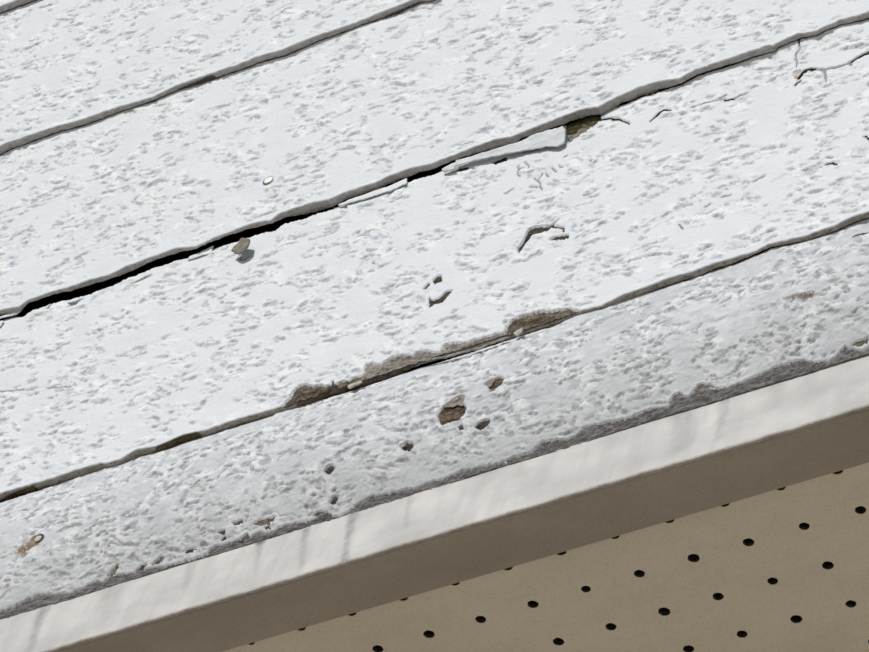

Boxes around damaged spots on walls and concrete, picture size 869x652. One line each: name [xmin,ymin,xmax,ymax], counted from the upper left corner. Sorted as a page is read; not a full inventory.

crack [793,39,869,86]
crack [505,147,567,194]
crack [519,225,569,253]
peeling [283,309,578,408]
peeling [438,395,467,431]
peeling [218,517,275,541]